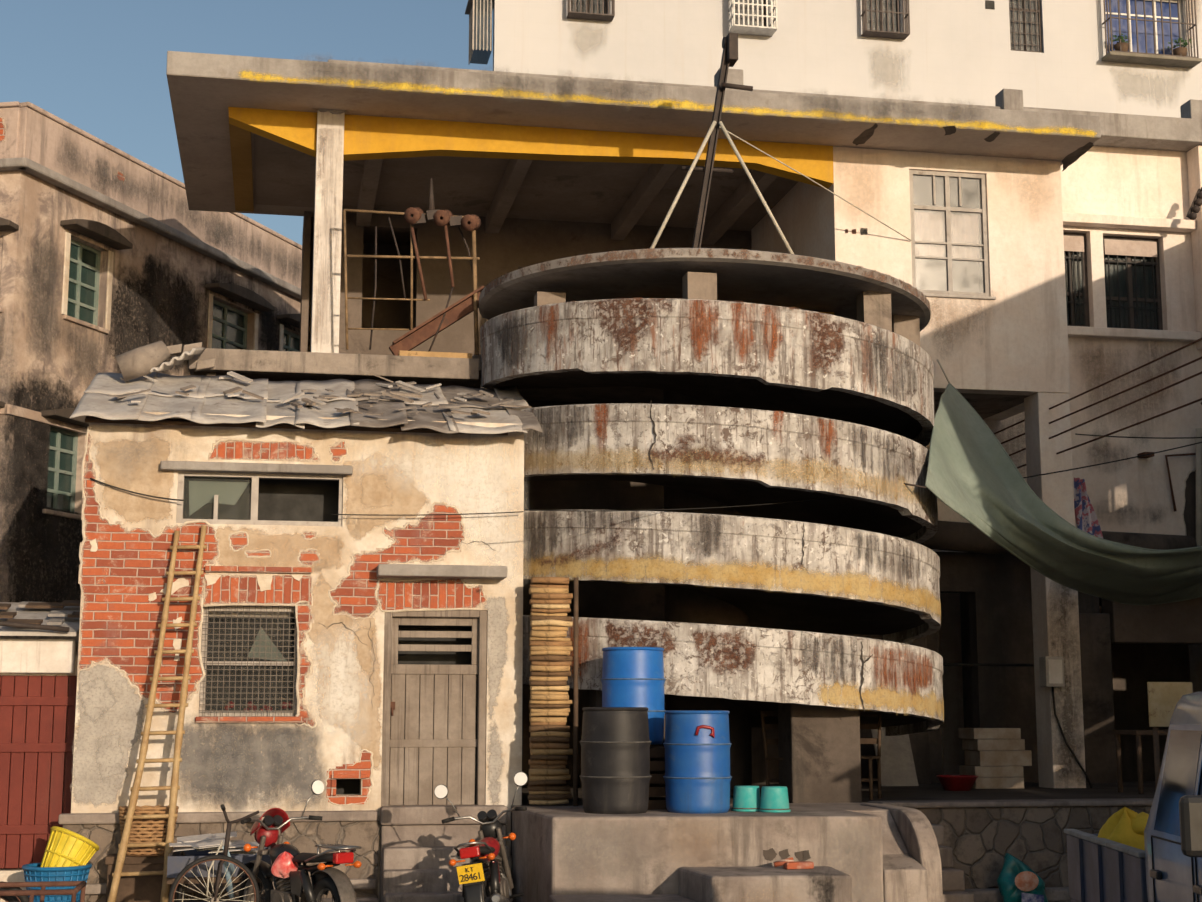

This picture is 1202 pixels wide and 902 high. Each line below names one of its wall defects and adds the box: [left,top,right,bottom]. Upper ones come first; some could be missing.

rust [689,300,782,361]
rust [807,314,844,374]
rust [595,403,608,438]
rust [819,419,837,456]
leakage [7,388,50,550]
leakage [858,536,920,577]
spalling [77,426,487,806]
rust [569,622,590,678]
rust [874,648,932,695]
leakage [179,723,322,807]